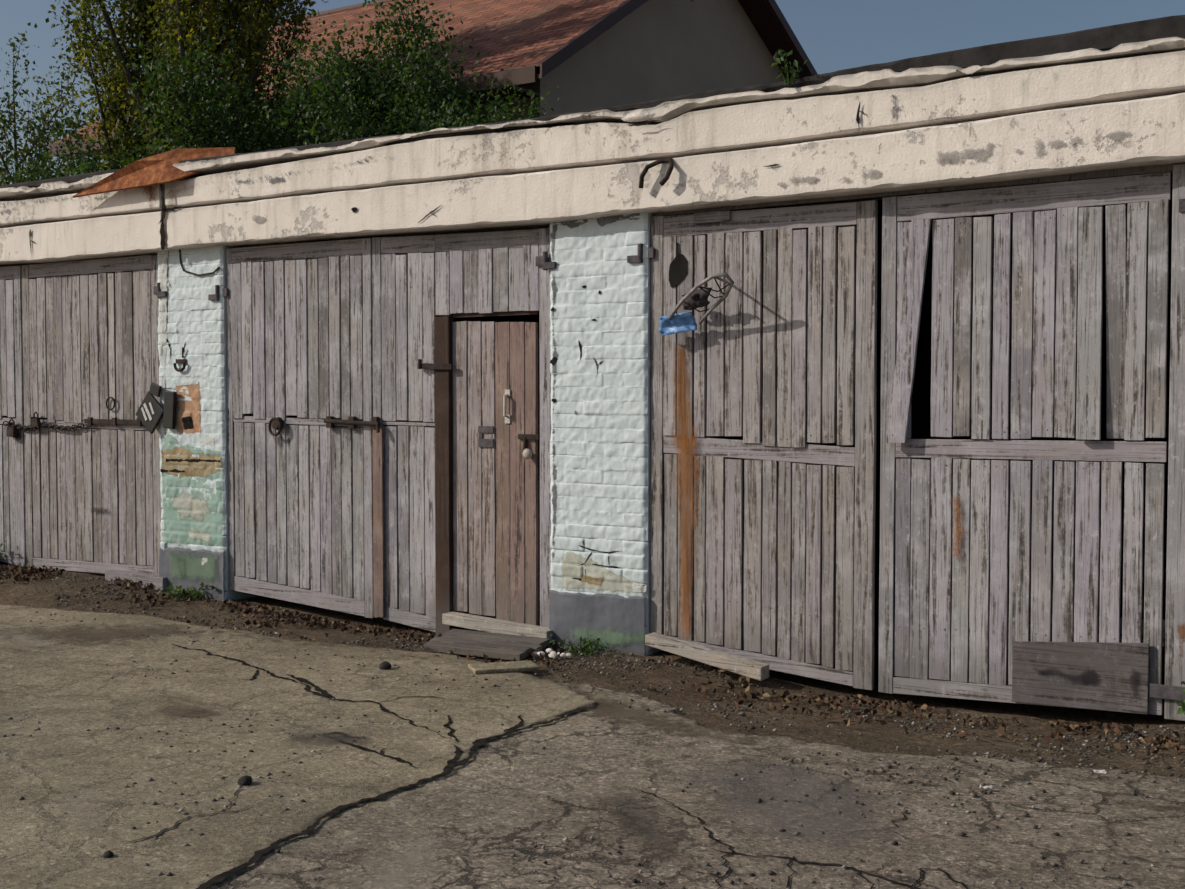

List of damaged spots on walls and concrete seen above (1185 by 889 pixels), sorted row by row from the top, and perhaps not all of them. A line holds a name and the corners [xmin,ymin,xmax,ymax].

peeling [777,176,818,187]
peeling [936,142,999,167]
peeling [1016,131,1130,157]
peeling [550,213,640,414]
peeling [160,381,223,565]
peeling [552,429,647,593]
rust [673,346,700,637]
crack [172,643,598,889]
crack [123,783,269,842]
crack [786,857,795,888]
crack [851,865,875,889]
crack [914,868,968,889]